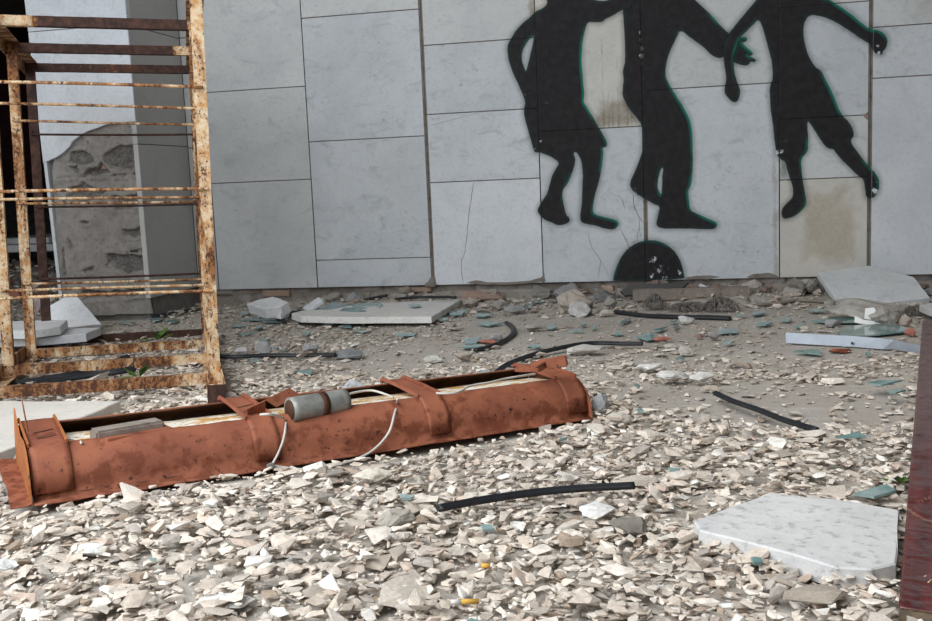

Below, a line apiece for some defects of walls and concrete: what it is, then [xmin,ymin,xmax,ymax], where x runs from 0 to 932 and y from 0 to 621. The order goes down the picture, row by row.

spalling [0,80,203,89]
spalling [0,102,195,110]
spalling [0,117,311,315]
spalling [342,274,545,301]
spalling [554,281,645,297]
spalling [683,273,826,293]
spalling [908,274,932,289]